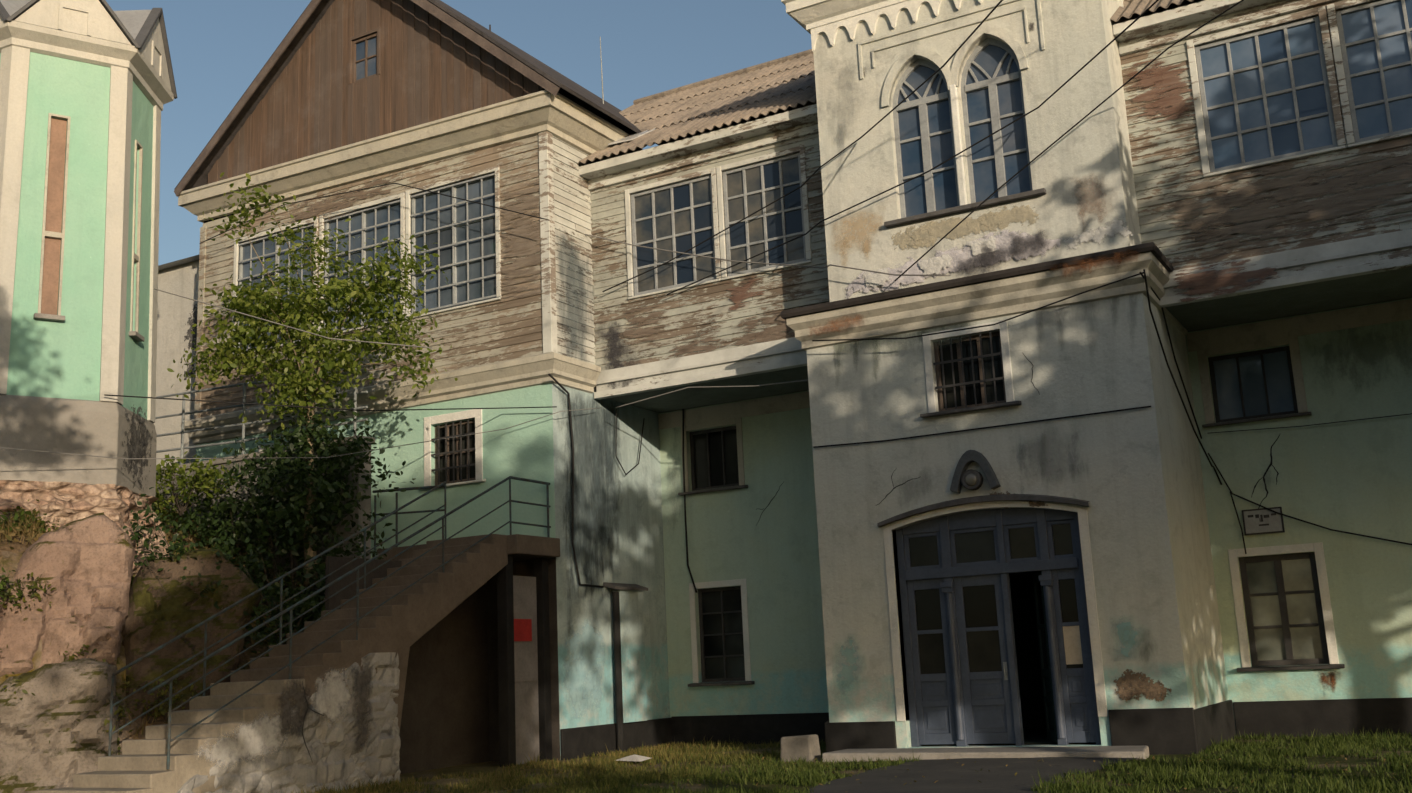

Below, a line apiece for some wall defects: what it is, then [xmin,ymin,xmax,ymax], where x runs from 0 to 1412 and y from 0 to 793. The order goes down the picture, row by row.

peeling [1123,58,1195,127]
flaking render [184,304,198,380]
peeling [288,178,391,228]
peeling [499,178,542,302]
peeling [623,276,798,358]
damp [958,232,1046,273]
peeling [1173,259,1278,302]
damp [569,402,614,582]
crack [877,469,920,505]
crack [1251,434,1280,509]
flaking render [201,668,372,765]
flaking render [1114,669,1172,701]